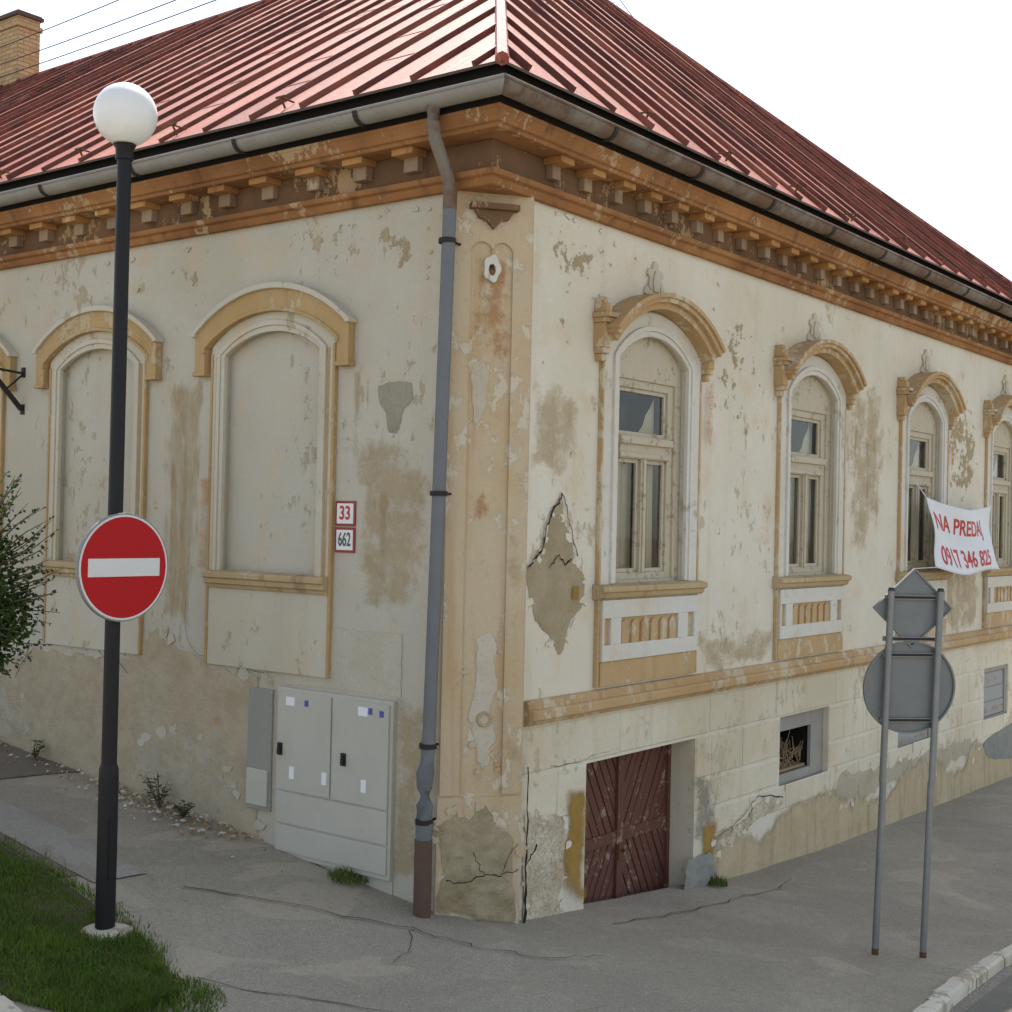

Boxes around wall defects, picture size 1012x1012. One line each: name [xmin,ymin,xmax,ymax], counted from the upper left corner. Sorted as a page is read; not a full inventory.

spalling [526,497,588,654]
peeling [461,632,504,775]
spalling [432,802,572,923]
spalling [711,795,783,859]